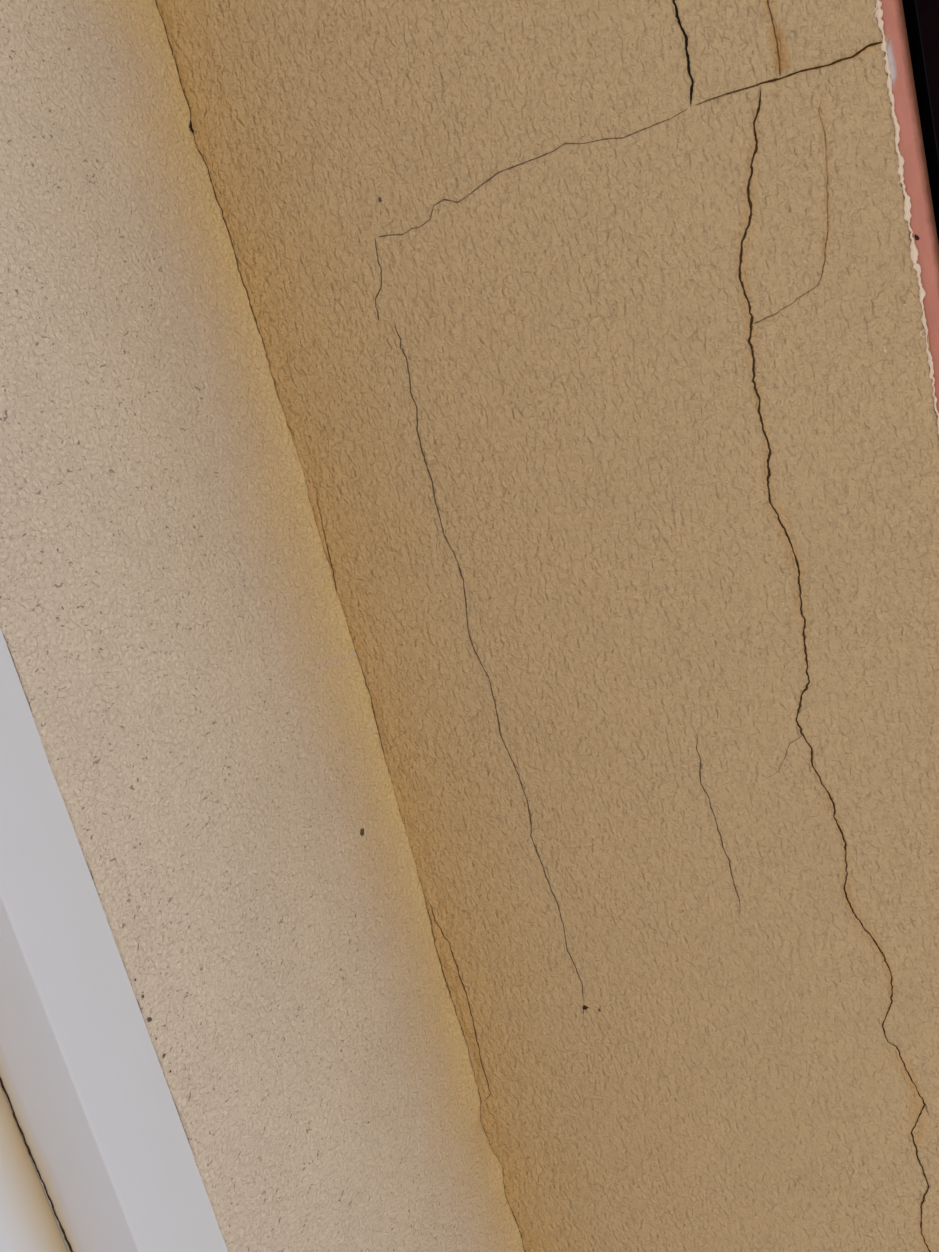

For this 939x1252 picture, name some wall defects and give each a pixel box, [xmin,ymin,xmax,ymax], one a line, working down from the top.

crack [155,0,276,384]
crack [317,502,337,590]
crack [361,668,385,758]
crack [375,0,933,1252]